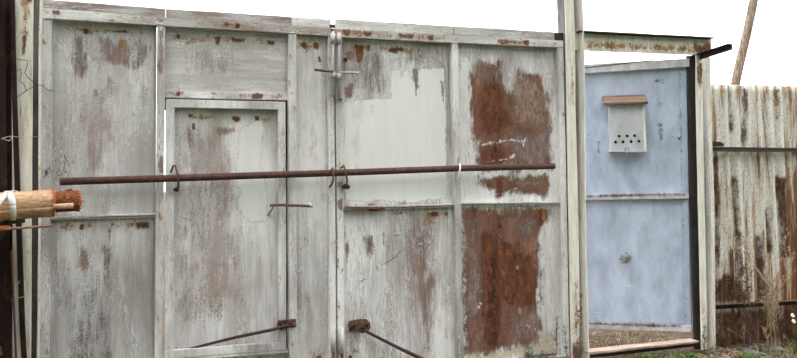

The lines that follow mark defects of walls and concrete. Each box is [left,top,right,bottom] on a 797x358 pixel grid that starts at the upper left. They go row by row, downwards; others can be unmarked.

corrosion [20,0,32,55]
corrosion [588,40,711,53]
corrosion [701,156,796,347]